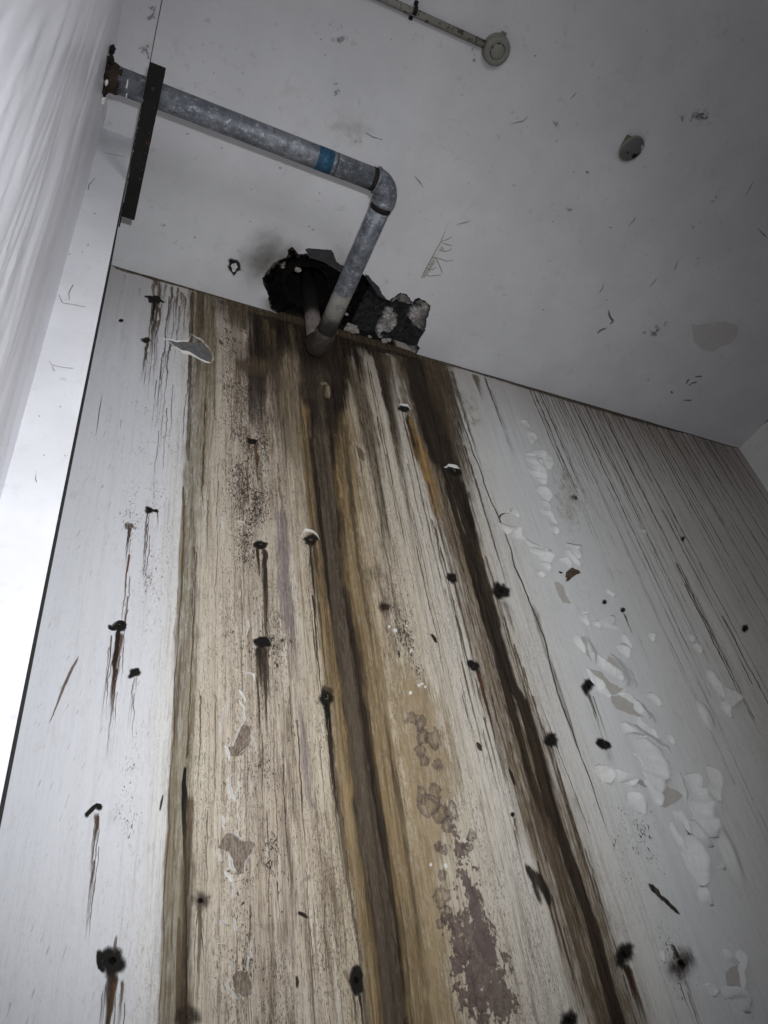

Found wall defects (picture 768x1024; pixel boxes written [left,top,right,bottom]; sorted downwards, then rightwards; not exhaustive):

corrosion [256,548,268,633]
peeling [498,419,582,604]
leakage [530,390,768,718]
corrosion [105,630,123,703]
corrosion [256,647,269,716]
leakage [114,268,665,1024]
peeling [220,689,254,802]
peeling [573,611,726,906]
corrosion [91,815,99,883]
peeling [217,814,256,899]
corrosion [106,971,124,1024]
peeling [216,940,255,1000]